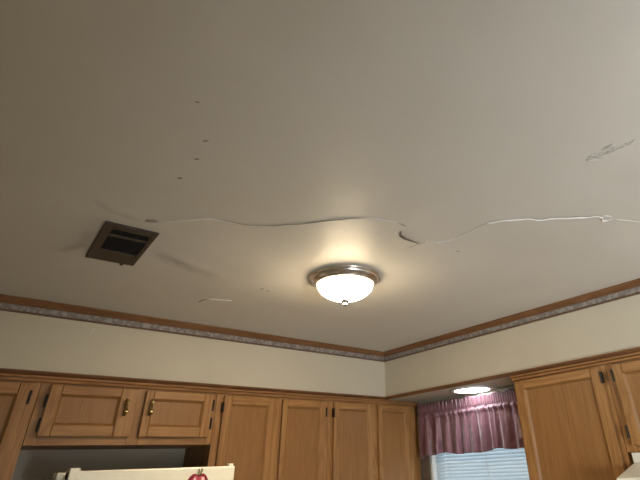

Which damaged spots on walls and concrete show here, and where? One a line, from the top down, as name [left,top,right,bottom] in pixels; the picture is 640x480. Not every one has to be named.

crack [156,217,420,252]
crack [438,216,640,244]